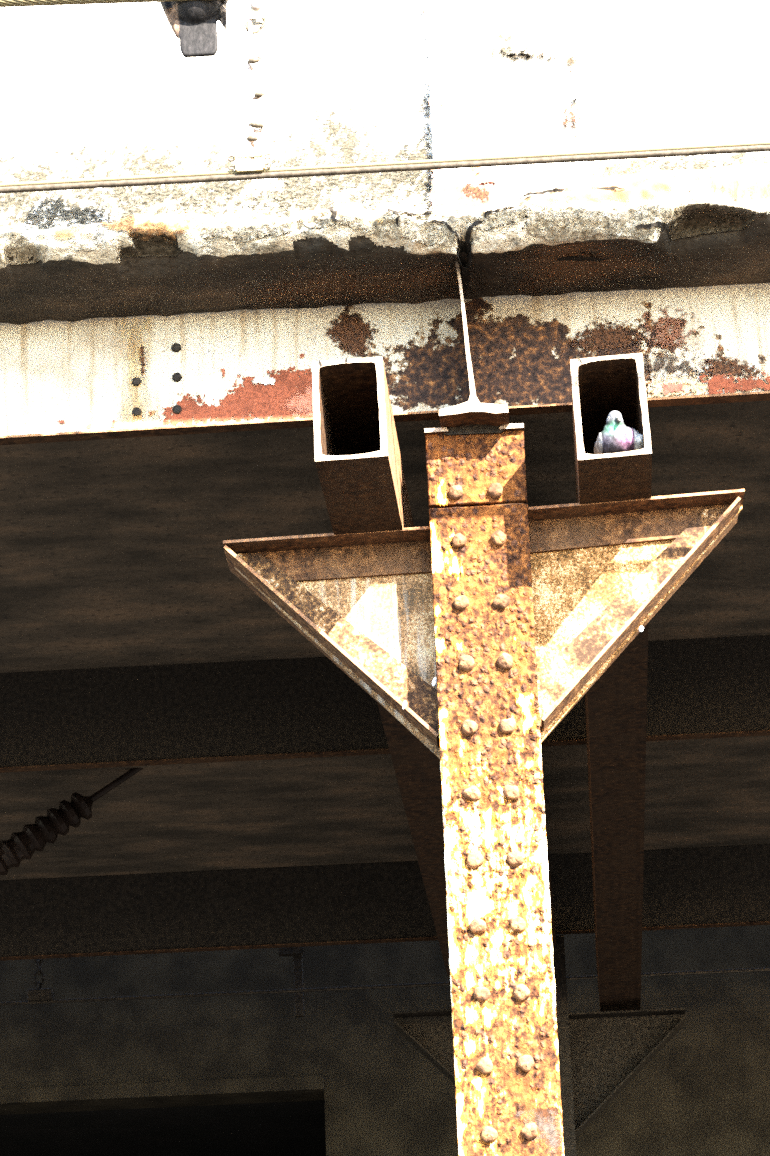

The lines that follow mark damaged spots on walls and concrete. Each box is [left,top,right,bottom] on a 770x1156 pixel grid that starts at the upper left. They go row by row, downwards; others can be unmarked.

damp [0,83,435,232]
corrosion [529,174,680,204]
spalling [0,230,46,265]
corrosion [101,210,205,238]
spalling [116,231,197,261]
spalling [200,169,768,269]
corrosion [324,313,376,357]
corrosion [567,307,764,381]
peeling [135,353,313,426]